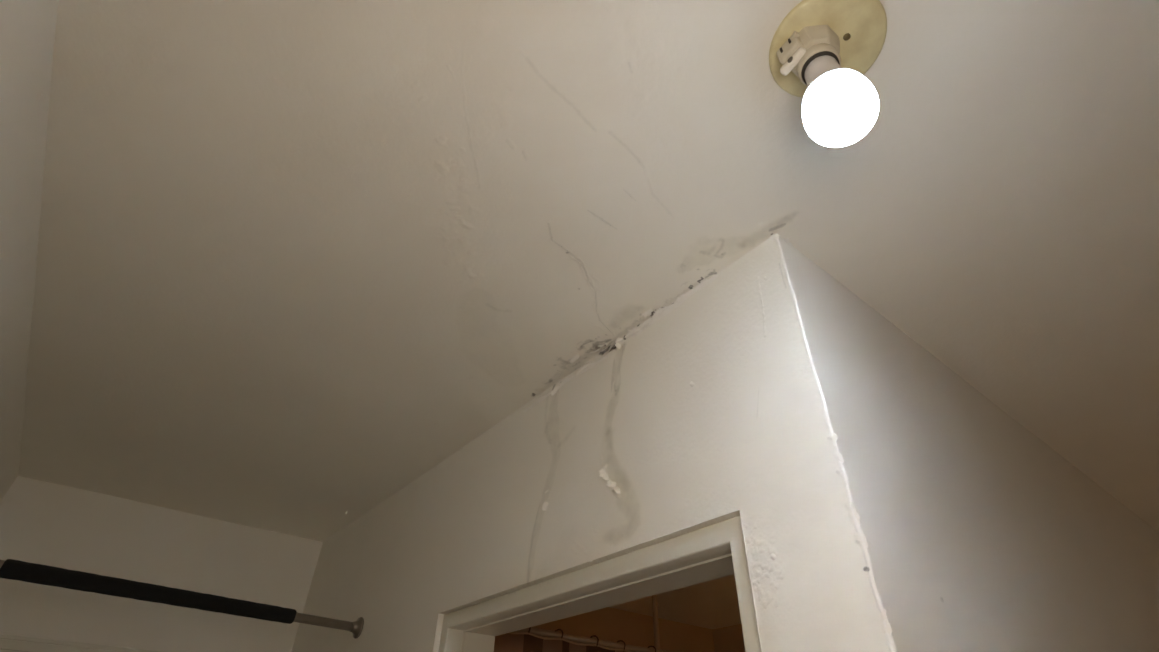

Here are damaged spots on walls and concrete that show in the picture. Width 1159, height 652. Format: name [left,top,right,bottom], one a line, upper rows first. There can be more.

peeling [522,274,718,412]